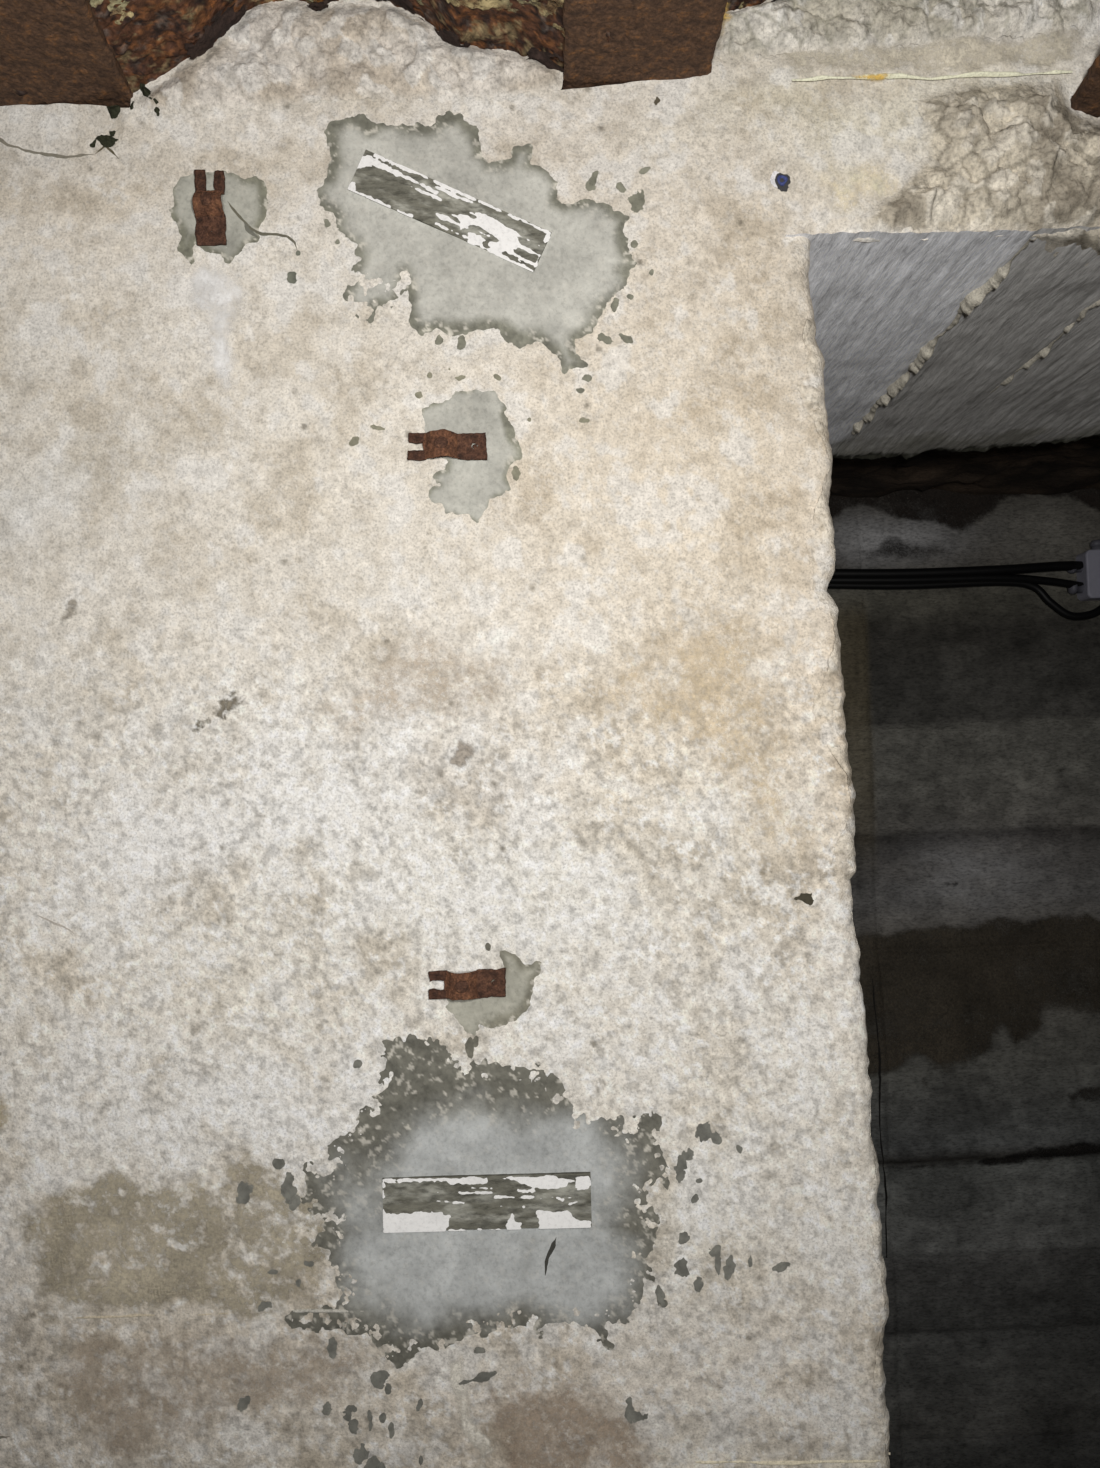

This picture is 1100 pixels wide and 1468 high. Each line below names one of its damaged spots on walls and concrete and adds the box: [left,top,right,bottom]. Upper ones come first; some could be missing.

crack [0,138,119,159]
flaking render [169,171,268,265]
flaking render [287,250,300,284]
flaking render [317,111,654,393]
flaking render [415,368,531,523]
leakage [828,489,1021,530]
leakage [856,914,1100,1075]
flaking render [258,943,753,1395]
leakage [979,1142,1100,1165]
leakage [25,1164,325,1316]
flaking render [322,1402,395,1468]
flaking render [624,1397,648,1424]